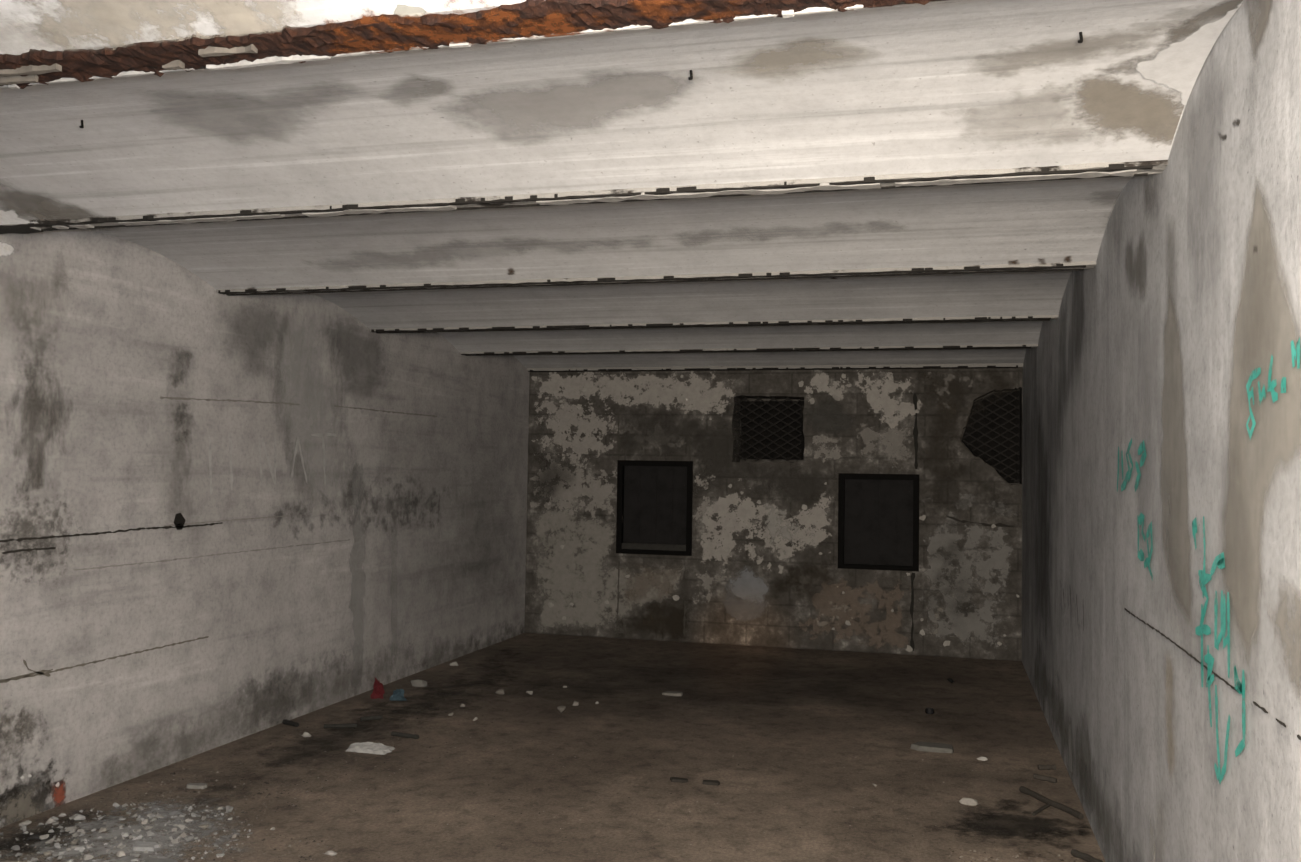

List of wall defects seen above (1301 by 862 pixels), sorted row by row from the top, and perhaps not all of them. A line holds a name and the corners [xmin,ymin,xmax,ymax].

leakage [27,0,296,50]
corrosion [326,0,611,54]
corrosion [629,0,741,23]
leakage [1167,0,1243,46]
leakage [1077,56,1184,142]
flaking render [0,210,38,225]
peeling [530,371,834,630]
peeling [798,370,923,430]
spalling [962,390,1020,483]
leakage [1161,297,1191,618]
leakage [1224,187,1301,649]
peeling [799,493,1019,652]